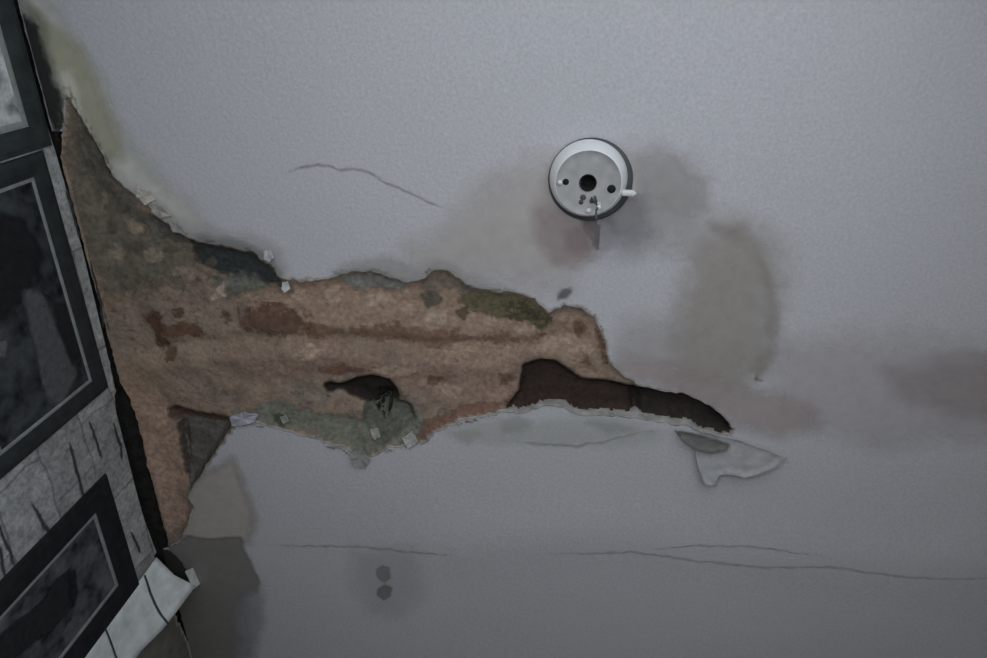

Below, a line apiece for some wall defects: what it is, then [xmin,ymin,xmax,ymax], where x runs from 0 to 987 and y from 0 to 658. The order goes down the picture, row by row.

spalling [59,97,787,547]
damp [440,176,569,274]